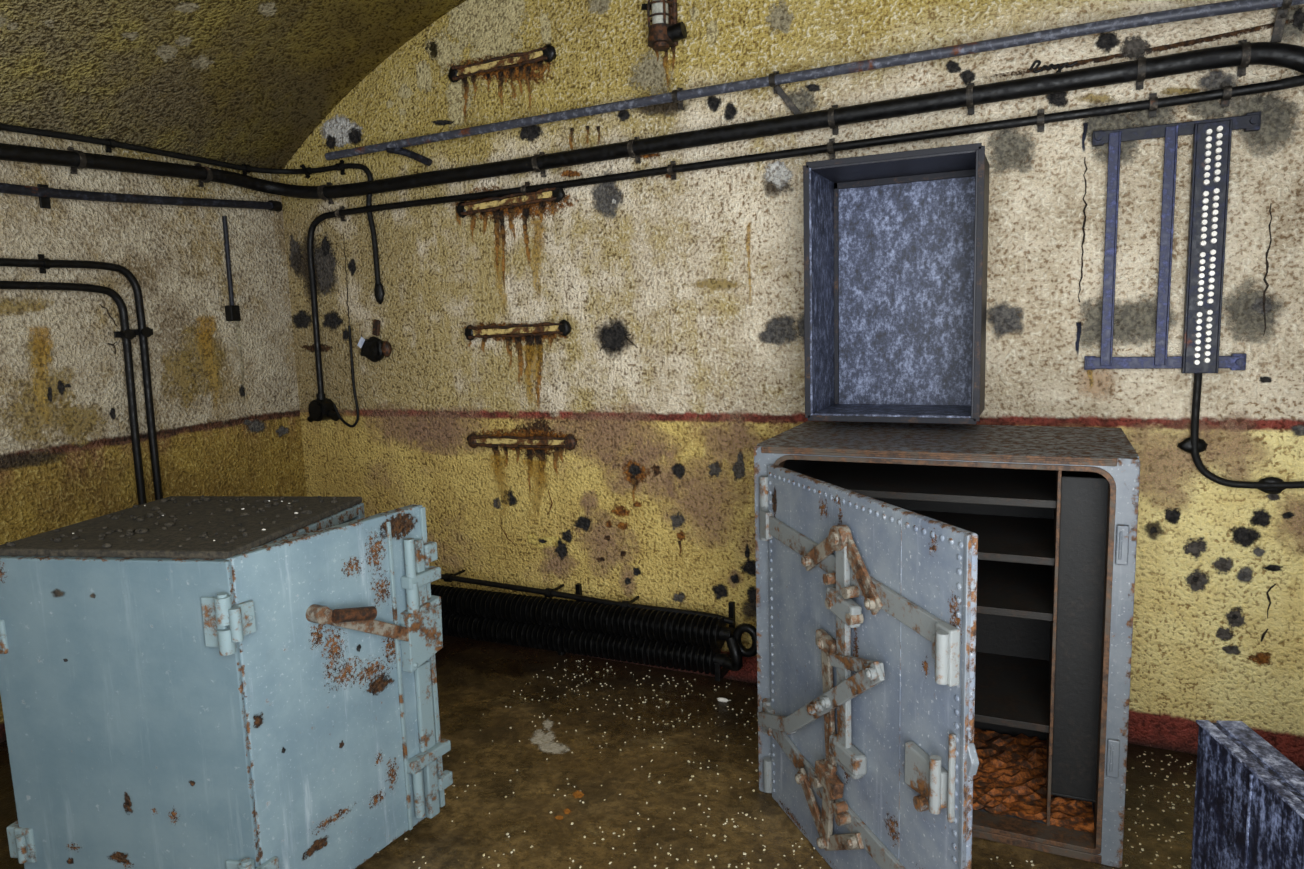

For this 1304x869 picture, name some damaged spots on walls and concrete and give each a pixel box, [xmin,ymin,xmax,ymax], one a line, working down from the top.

rust [448,54,554,119]
rust [655,46,676,85]
rust [569,126,601,149]
rust [452,186,578,301]
leakage [0,299,54,315]
leakage [161,319,224,408]
leakage [0,329,106,470]
rust [461,322,578,515]
leakage [1138,435,1195,499]
leakage [1286,503,1304,537]